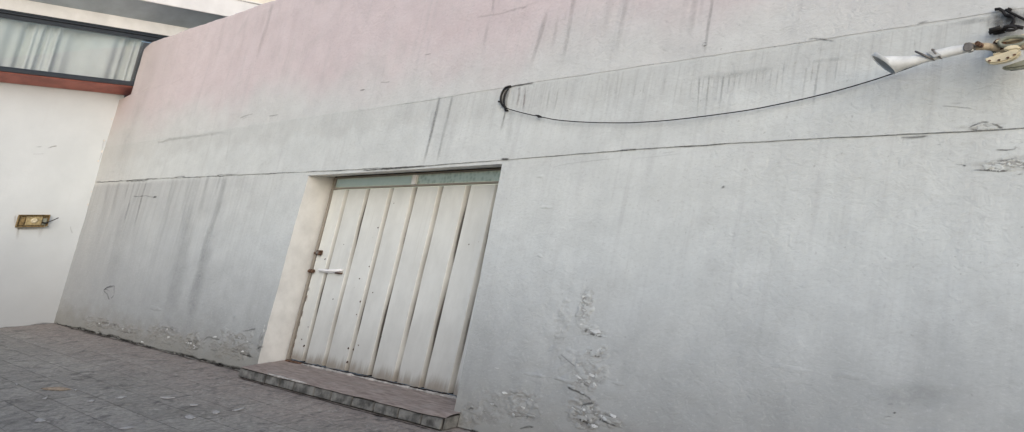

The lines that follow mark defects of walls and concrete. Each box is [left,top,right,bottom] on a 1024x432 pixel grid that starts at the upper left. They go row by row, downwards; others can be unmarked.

peeling [980,158,1024,173]
peeling [555,323,626,432]